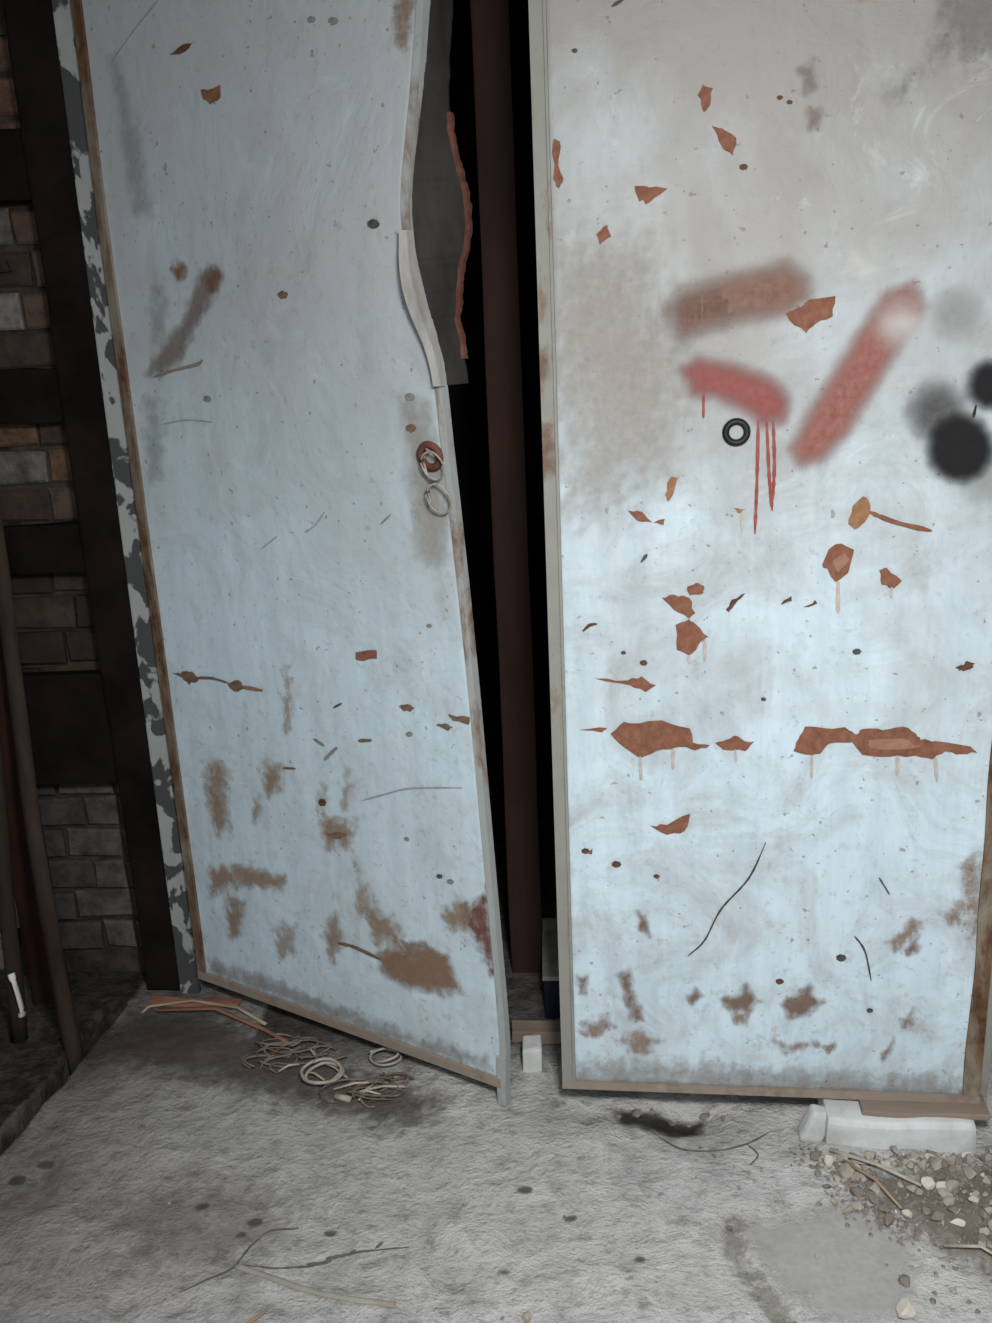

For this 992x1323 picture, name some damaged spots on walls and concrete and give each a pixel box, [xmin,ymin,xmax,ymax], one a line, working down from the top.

rust [322,814,350,849]
rust [327,888,458,992]
rust [443,895,494,975]